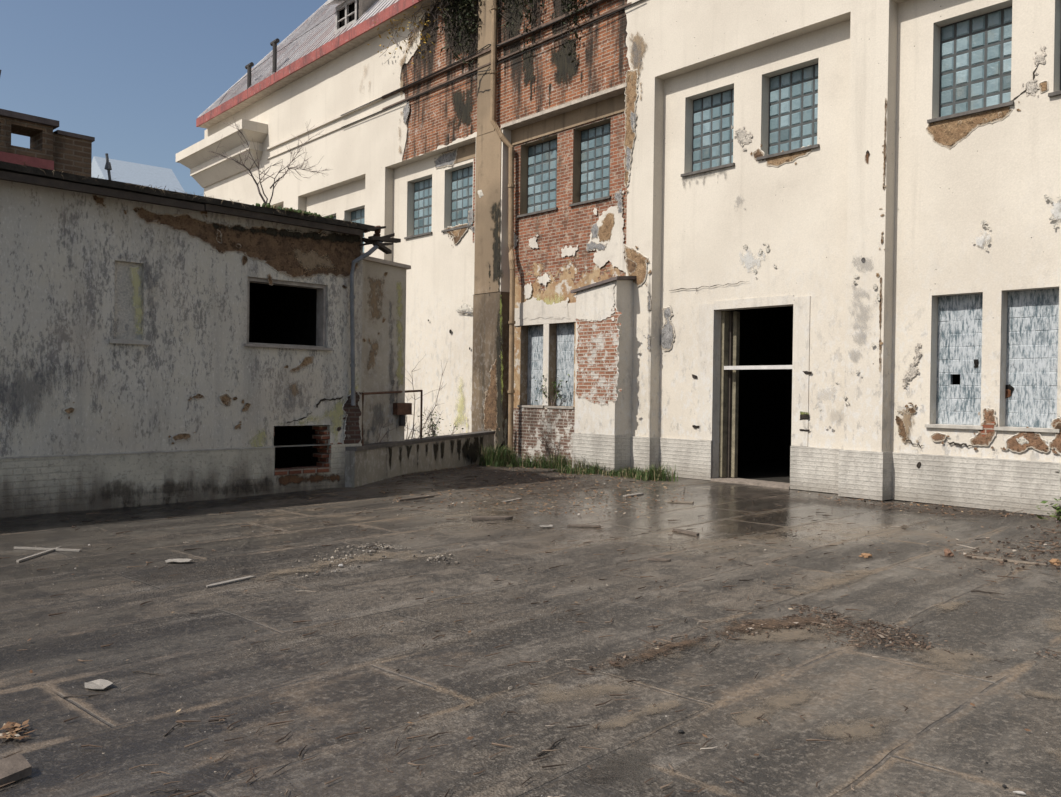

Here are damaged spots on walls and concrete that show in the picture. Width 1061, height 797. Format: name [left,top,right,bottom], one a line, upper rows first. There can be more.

flaking render [401,0,479,169]
water stain [447,0,474,150]
water stain [503,0,535,101]
water stain [549,0,583,106]
spalling [926,46,1049,150]
flaking render [496,0,675,352]
spalling [124,205,363,289]
spalling [362,272,388,370]
flaking render [518,273,622,406]
flaking render [969,408,1061,456]